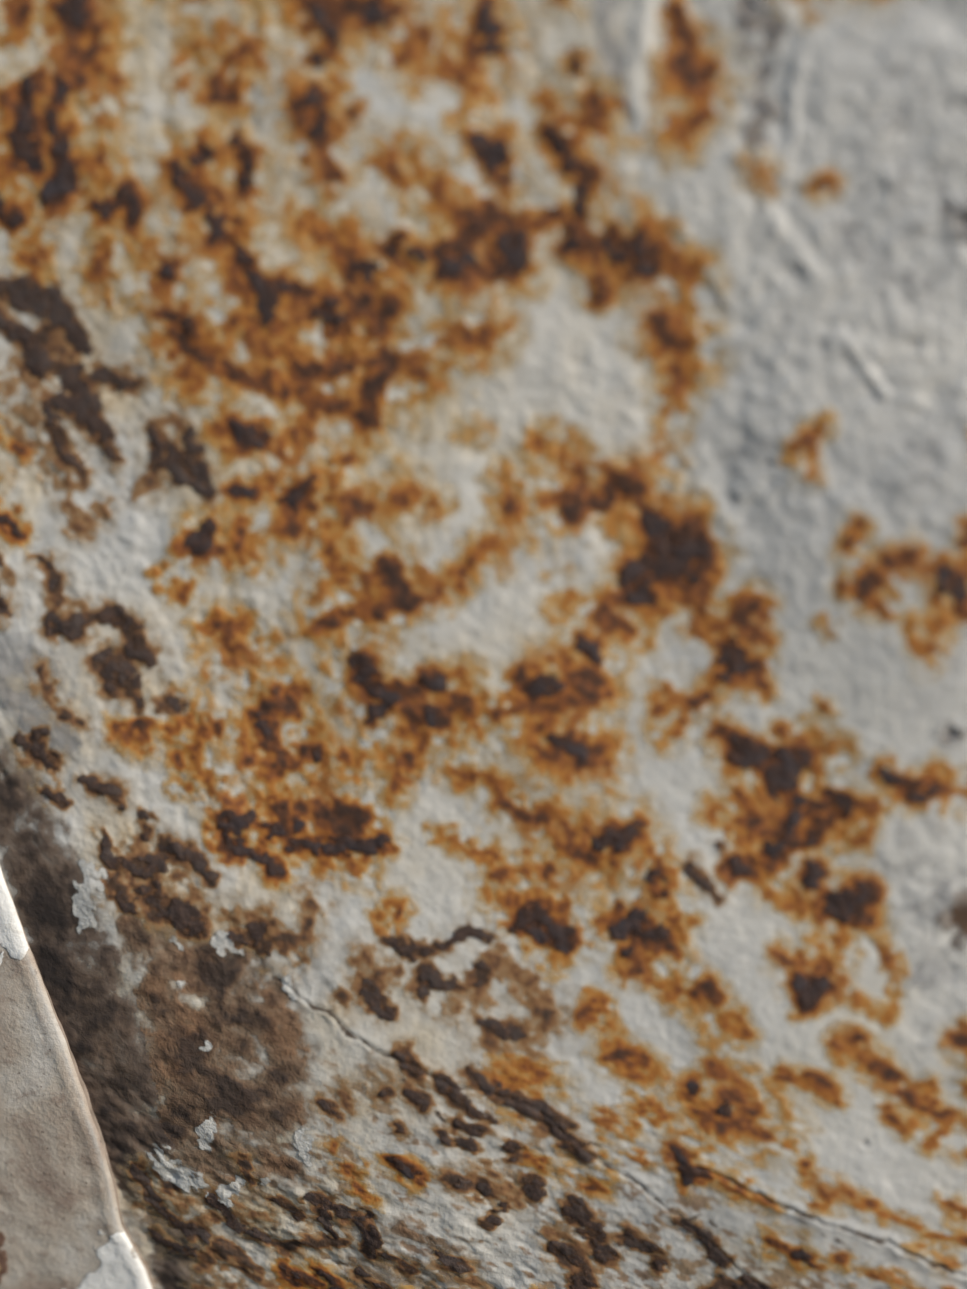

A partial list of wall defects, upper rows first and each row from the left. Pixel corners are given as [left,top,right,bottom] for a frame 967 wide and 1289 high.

rust [0,0,967,1029]
damp [0,645,81,755]
peeling [0,867,29,965]
crack [309,1003,464,1090]
rust [330,790,967,1289]
rust [311,1078,357,1124]
spalling [0,1232,8,1284]
peeling [77,1229,152,1289]
rust [125,1135,493,1289]
crack [559,1128,745,1274]
crack [724,1177,967,1274]